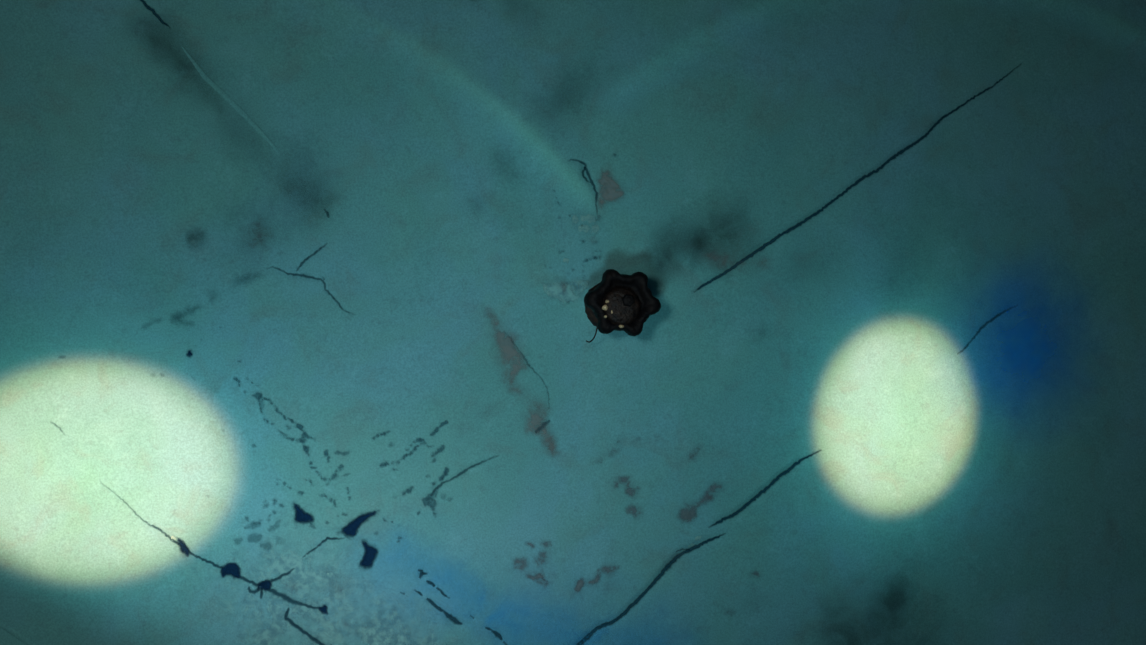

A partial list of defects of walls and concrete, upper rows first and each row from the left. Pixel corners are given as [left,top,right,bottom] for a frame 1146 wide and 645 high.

crack [140,0,168,26]
crack [574,160,598,201]
crack [697,70,1013,290]
crack [279,248,341,307]
crack [961,311,1005,352]
peeling [284,416,343,479]
peeling [404,468,449,514]
crack [431,463,480,495]
crack [577,451,819,645]
crack [151,525,338,645]
crack [417,570,507,645]